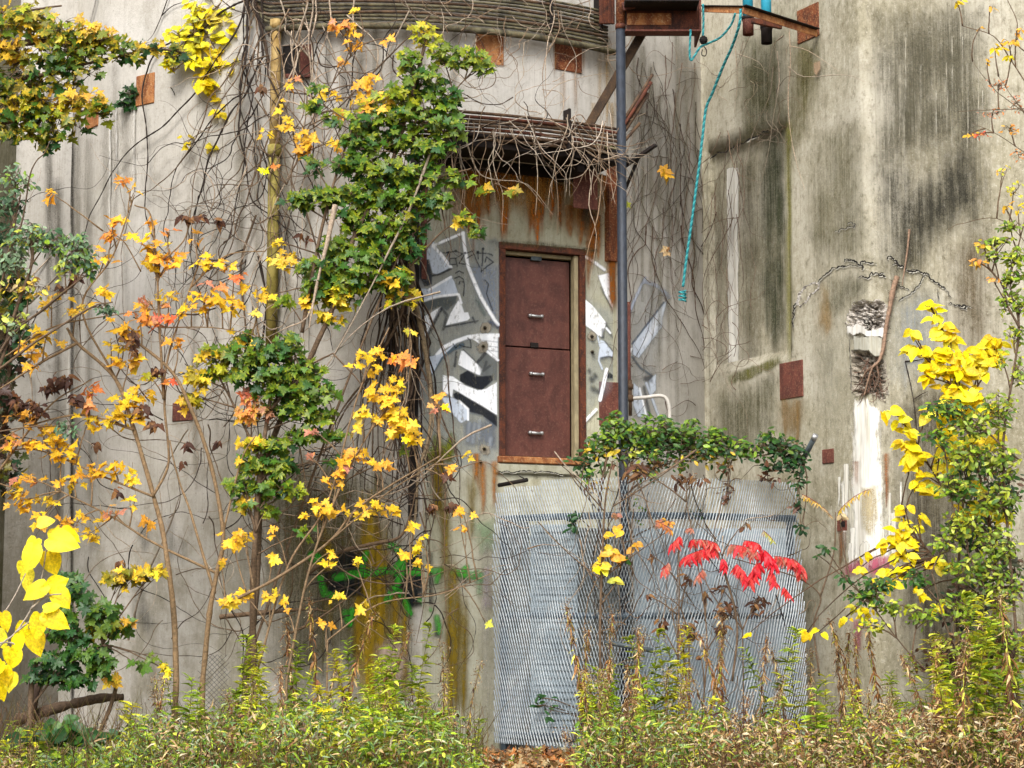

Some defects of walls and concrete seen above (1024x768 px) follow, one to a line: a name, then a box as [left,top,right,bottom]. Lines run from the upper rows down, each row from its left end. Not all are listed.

water stain [742,40,779,132]
water stain [880,17,983,271]
corrosion [454,170,616,306]
water stain [717,127,792,363]
crack [818,256,972,311]
spalling [845,299,889,403]
corrosion [474,453,497,509]